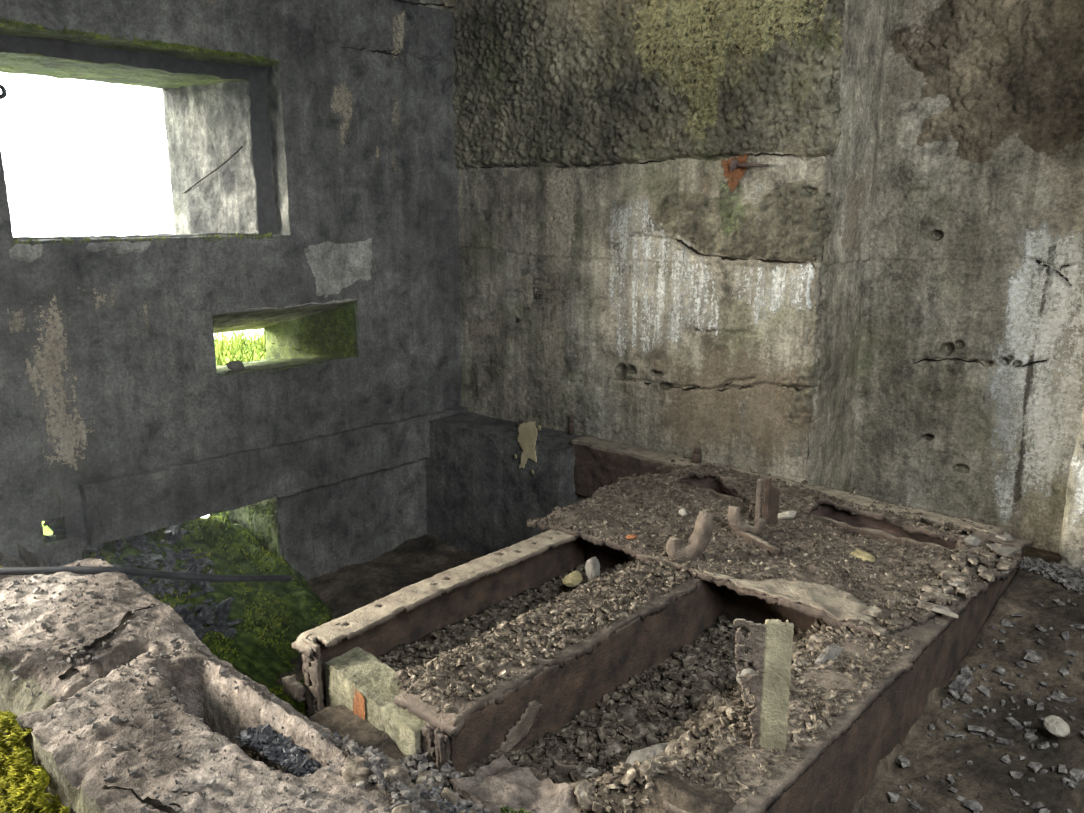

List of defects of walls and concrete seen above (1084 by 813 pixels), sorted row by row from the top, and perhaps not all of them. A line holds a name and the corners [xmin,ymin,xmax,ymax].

crack [471,152,832,169]
rust [701,154,748,200]
crack [632,235,817,264]
crack [1032,259,1072,286]
spalling [614,364,637,380]
spalling [651,370,674,390]
crack [913,358,1047,368]
damp [983,223,1084,530]